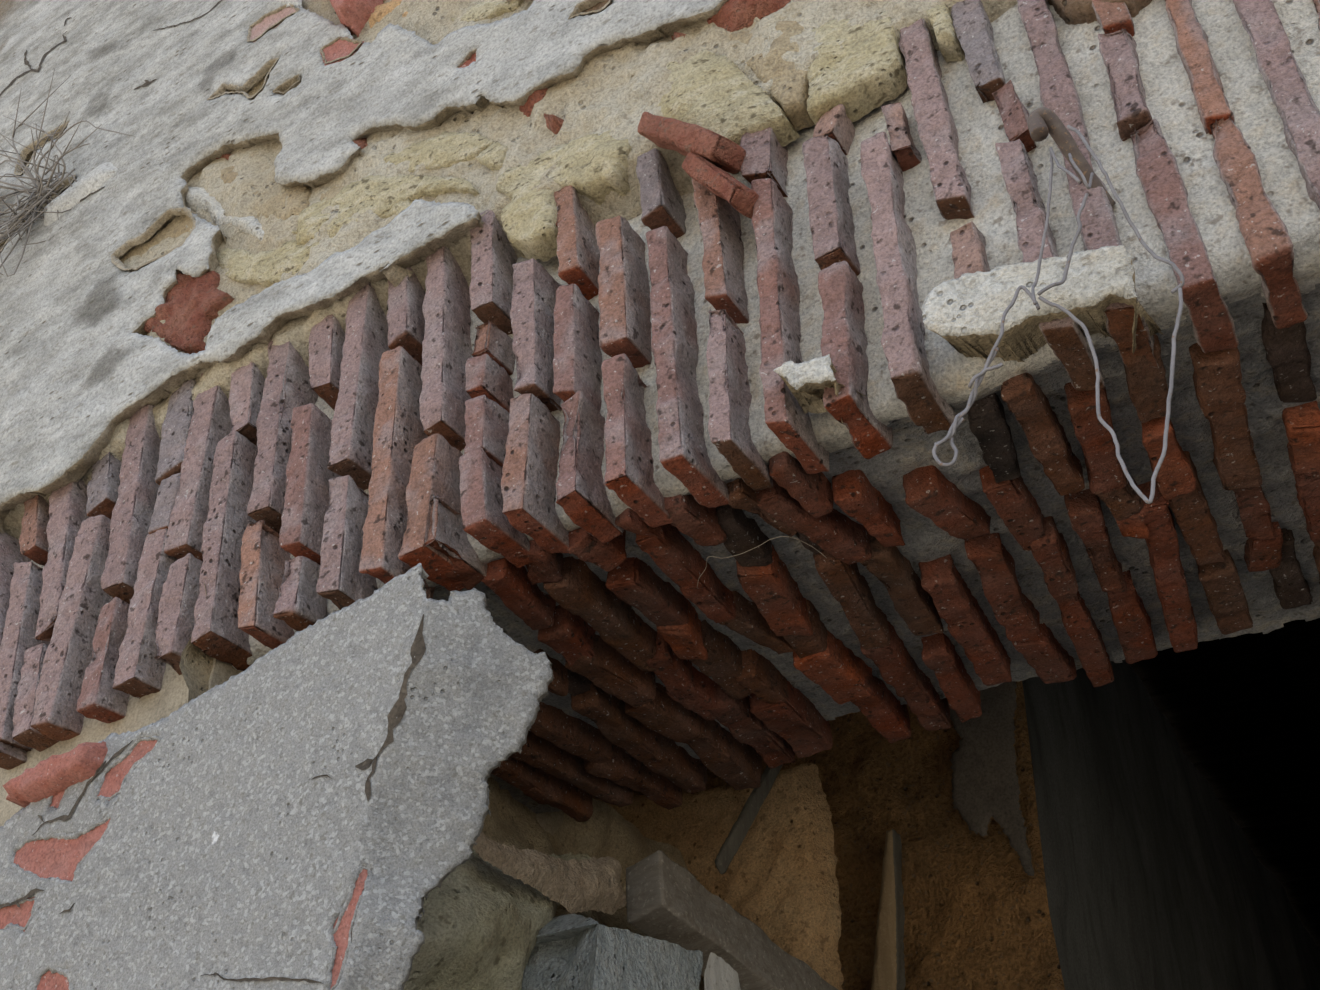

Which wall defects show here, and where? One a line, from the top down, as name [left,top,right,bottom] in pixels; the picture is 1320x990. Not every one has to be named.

spalling [247,3,300,43]
spalling [568,0,612,19]
spalling [320,36,364,66]
spalling [207,58,301,100]
spalling [111,207,196,272]
crack [311,614,426,801]
spalling [0,736,161,931]
spalling [325,867,372,990]
spalling [31,964,74,990]